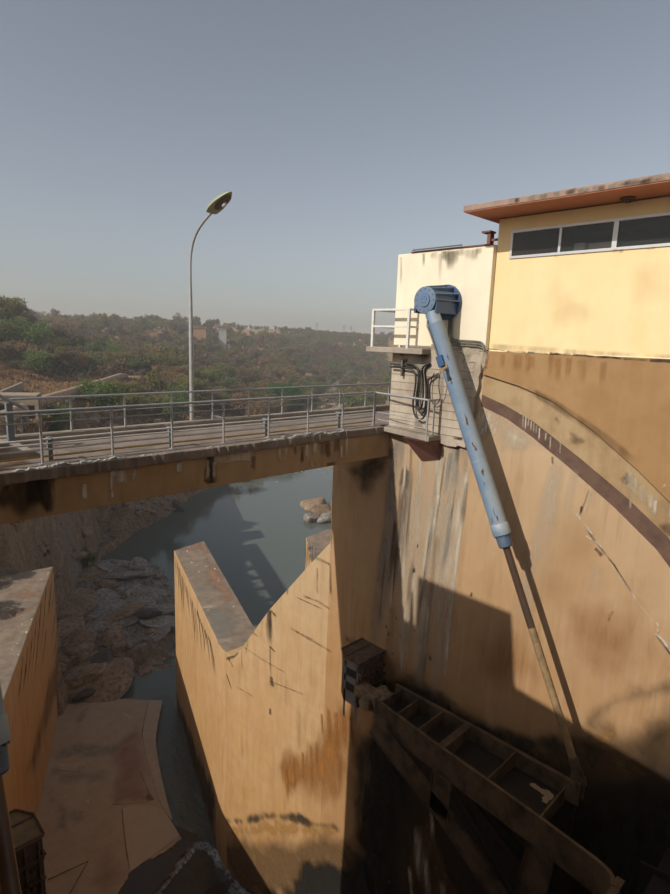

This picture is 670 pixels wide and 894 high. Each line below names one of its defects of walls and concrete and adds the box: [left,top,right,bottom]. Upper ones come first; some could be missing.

water stain [361,441,468,676]
crack [575,506,670,654]
rust [281,710,353,793]
water stain [383,679,534,748]
water stain [233,813,312,836]